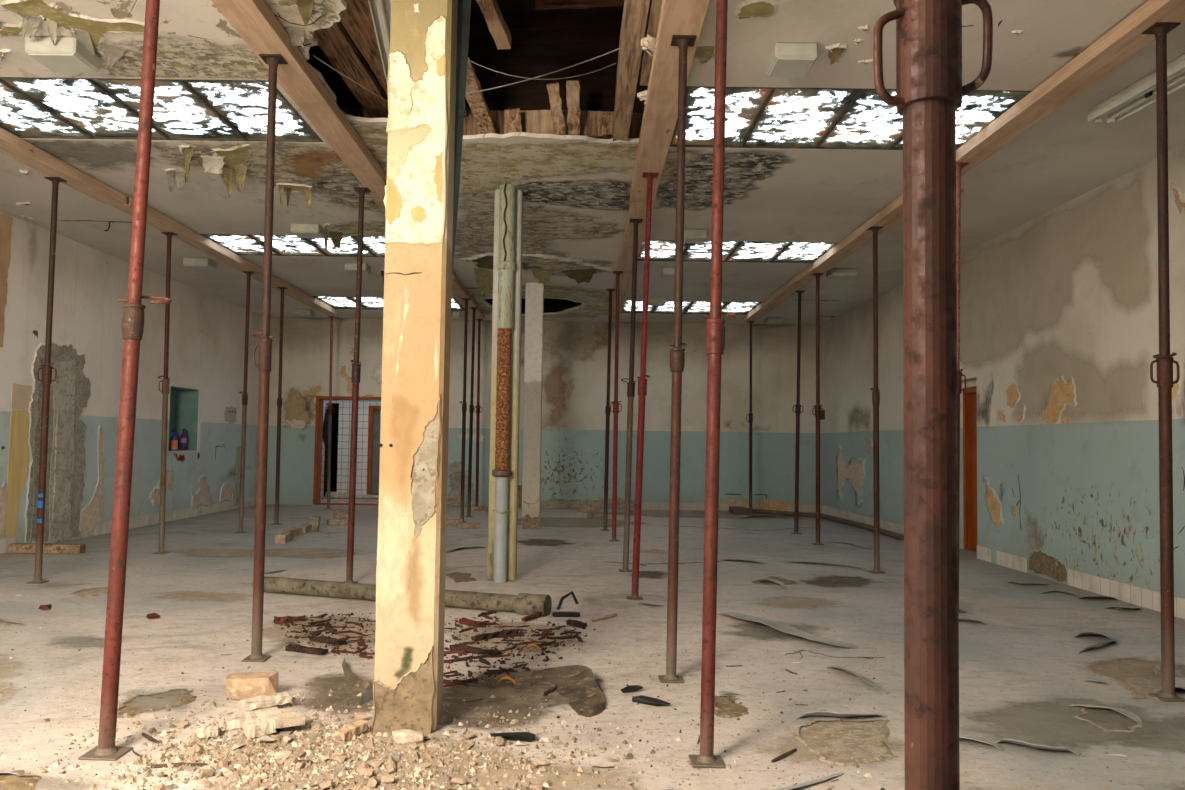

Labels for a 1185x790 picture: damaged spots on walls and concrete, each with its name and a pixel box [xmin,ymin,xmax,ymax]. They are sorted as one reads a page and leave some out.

peeling [0,0,145,69]
peeling [384,15,447,246]
damp [656,151,789,210]
peeling [459,252,494,299]
damp [455,142,638,317]
peeling [522,253,615,285]
spalling [24,330,104,543]
spalling [409,393,475,539]
damp [544,331,607,425]
damp [976,384,993,422]
peeling [983,476,1018,533]
peeling [1028,486,1160,590]